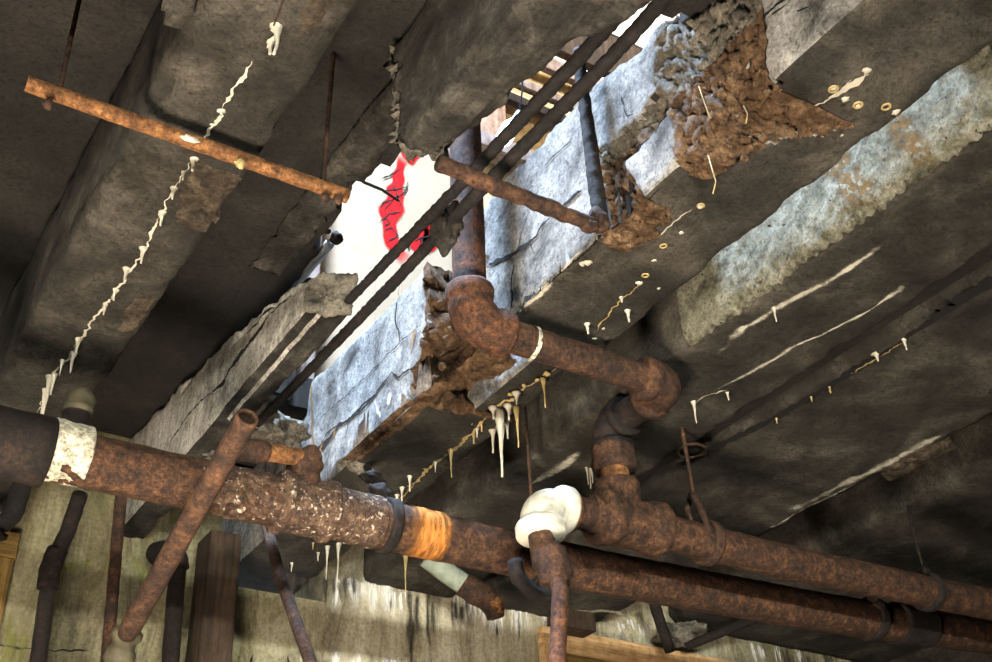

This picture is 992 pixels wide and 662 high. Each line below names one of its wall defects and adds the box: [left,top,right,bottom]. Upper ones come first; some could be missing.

water stain [266,22,283,55]
water stain [180,62,252,144]
spalling [383,40,456,163]
water stain [828,67,872,109]
water stain [39,157,199,414]
spalling [254,179,518,475]
water stain [563,251,593,269]
water stain [584,273,649,340]
water stain [733,253,871,336]
water stain [738,292,896,379]
water stain [395,368,556,502]
water stain [691,390,729,423]